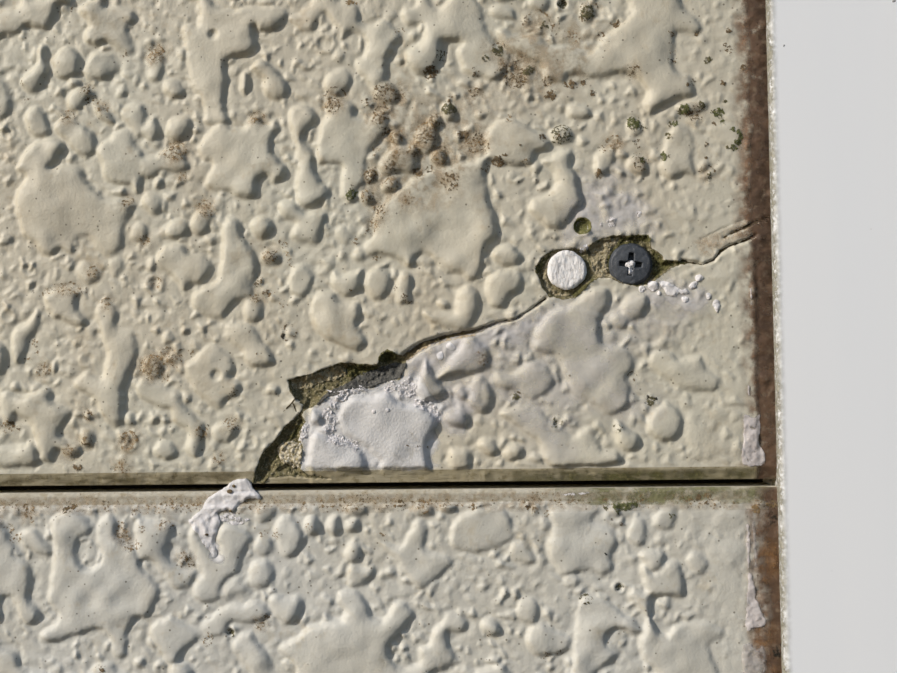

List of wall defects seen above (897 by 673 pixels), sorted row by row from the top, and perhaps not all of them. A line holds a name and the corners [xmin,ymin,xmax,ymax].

spalling [535,234,703,303]
crack [680,217,771,265]
crack [403,298,546,361]
peeling [188,349,447,563]